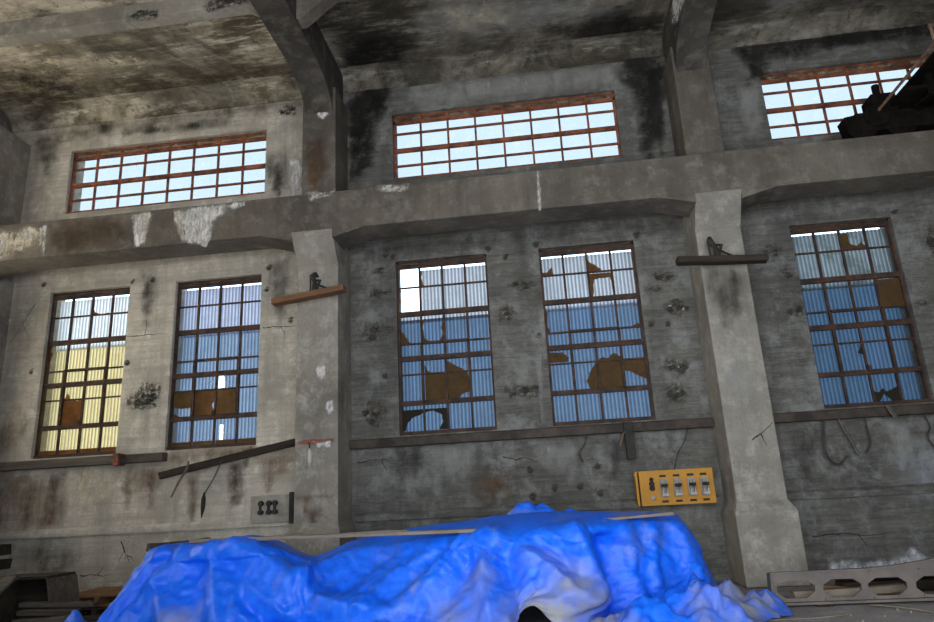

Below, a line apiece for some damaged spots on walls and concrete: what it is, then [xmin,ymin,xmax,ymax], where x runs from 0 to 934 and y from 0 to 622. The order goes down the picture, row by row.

damp [587,21,623,37]
damp [290,159,302,194]
peeling [0,227,39,258]